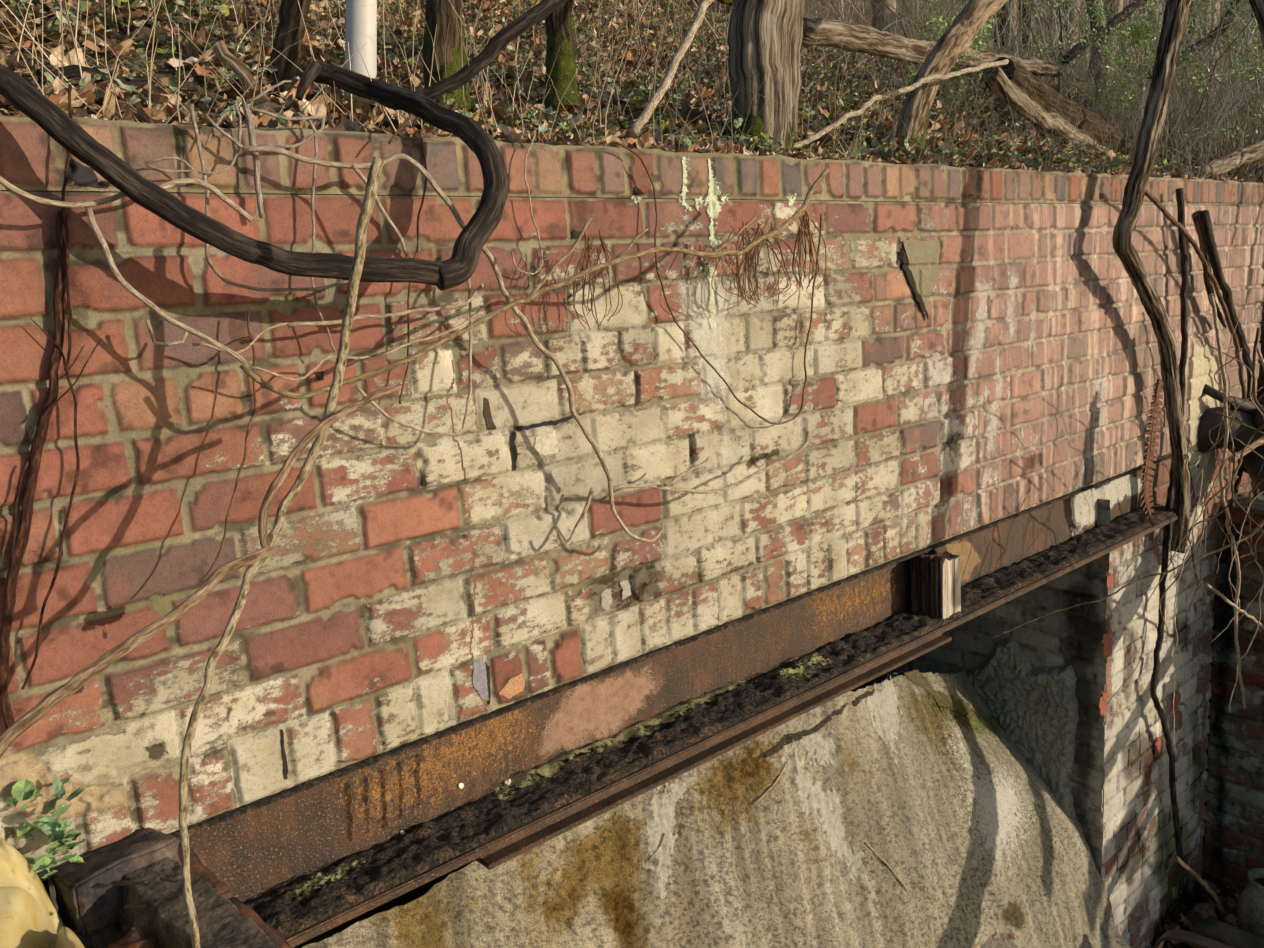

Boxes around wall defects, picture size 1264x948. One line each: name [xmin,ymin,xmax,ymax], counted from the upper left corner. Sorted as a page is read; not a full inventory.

leakage [679,156,691,213]
peeling [0,202,1028,881]
rust [946,540,980,582]
peeling [1070,438,1144,538]
rust [340,666,660,828]
leakage [643,776,690,911]
crack [760,689,875,759]
leakage [779,731,875,888]
leakage [862,676,903,764]
peeling [1099,494,1264,948]